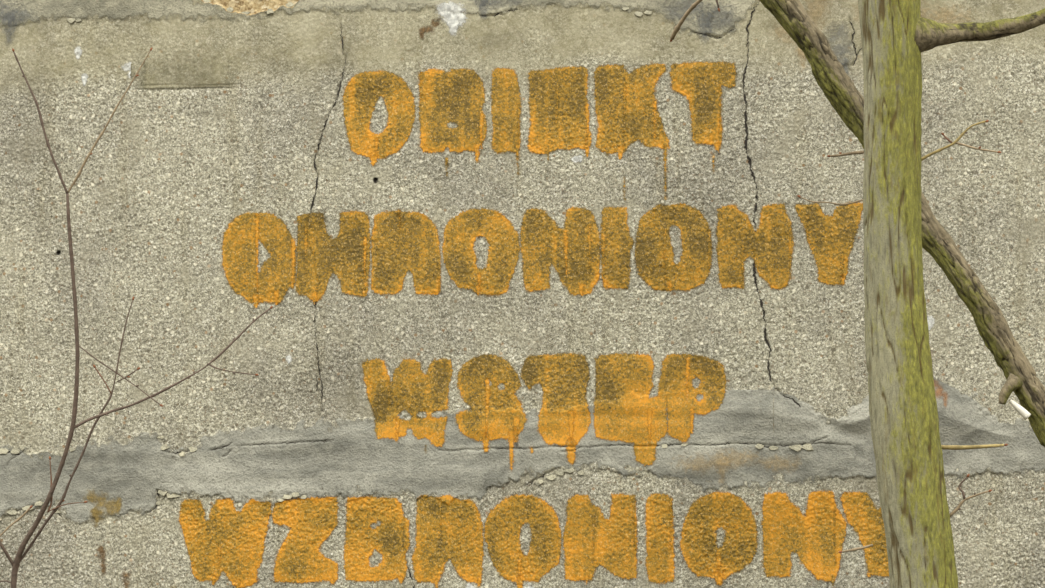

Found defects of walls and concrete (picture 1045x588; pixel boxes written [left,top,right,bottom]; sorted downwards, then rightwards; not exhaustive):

crack [310,24,346,213]
crack [691,4,758,232]
crack [313,301,323,411]
crack [753,260,801,407]